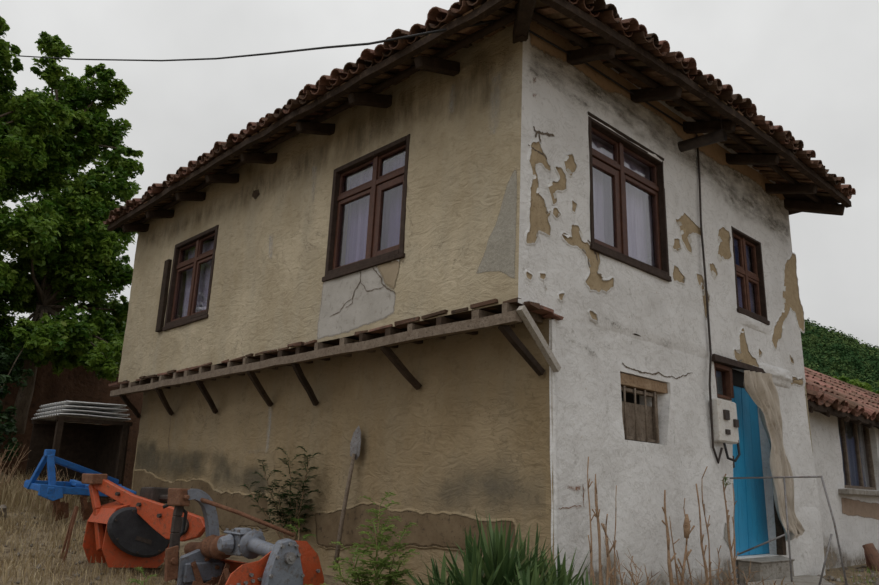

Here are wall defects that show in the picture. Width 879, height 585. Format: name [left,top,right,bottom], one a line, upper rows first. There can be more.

peeling [524,140,615,295]
peeling [671,211,701,255]
crack [331,267,395,316]
peeling [671,226,732,320]
peeling [771,252,805,351]
crack [622,363,690,379]
peeling [732,327,763,367]